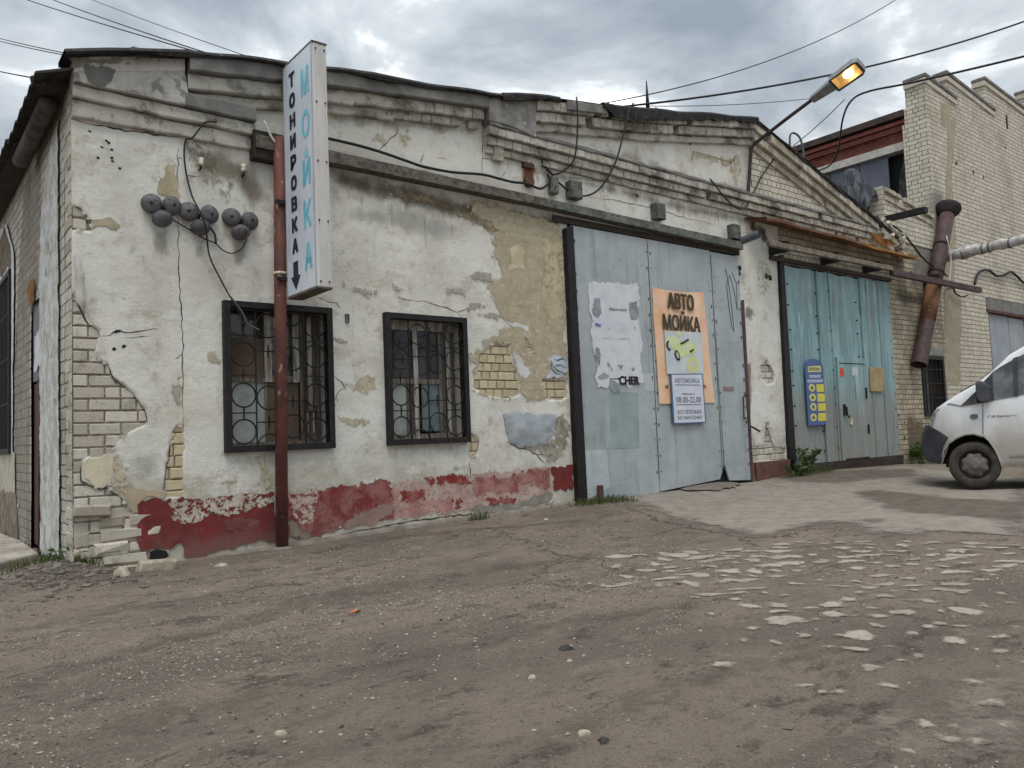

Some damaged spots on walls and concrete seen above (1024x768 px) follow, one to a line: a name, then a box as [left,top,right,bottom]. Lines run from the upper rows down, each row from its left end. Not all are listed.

peeling [157,163,181,198]
flaking render [72,207,120,231]
crack [74,216,184,490]
peeling [338,183,571,529]
flaking render [760,360,774,384]
flaking render [70,294,275,568]
flaking render [752,422,785,461]
peeling [288,487,320,539]